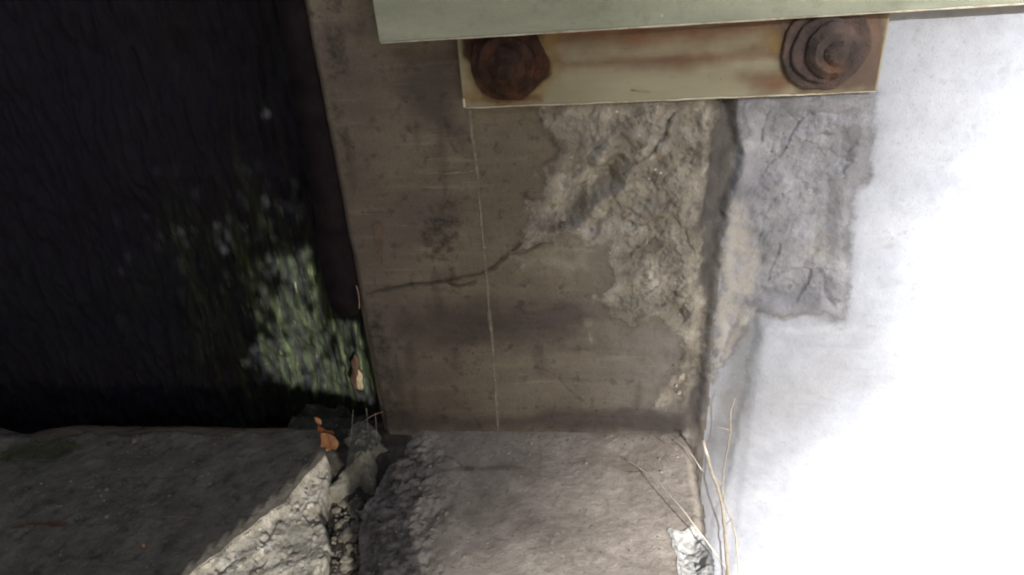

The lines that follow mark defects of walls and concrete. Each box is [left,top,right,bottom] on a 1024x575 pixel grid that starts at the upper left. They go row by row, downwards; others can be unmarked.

rust [463,38,477,61]
rust [482,19,795,103]
rust [802,12,884,91]
spalling [520,93,876,410]